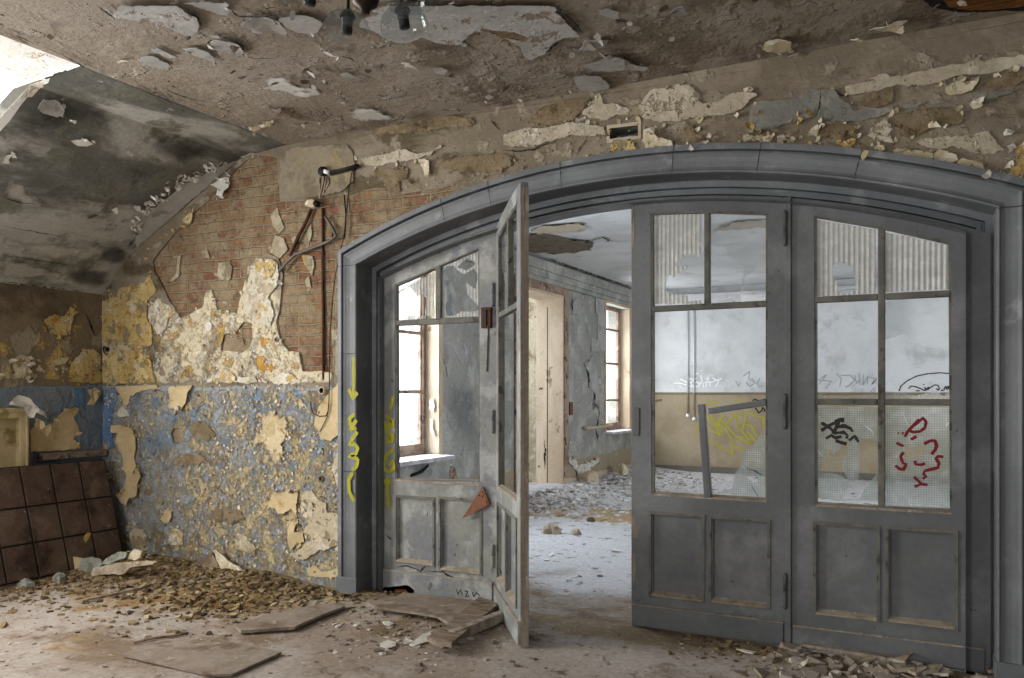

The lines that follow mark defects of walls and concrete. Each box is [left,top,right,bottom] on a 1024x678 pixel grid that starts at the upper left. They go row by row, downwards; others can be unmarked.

peeling [104,0,340,69]
peeling [353,1,1024,178]
peeling [248,119,274,136]
damp [8,184,34,205]
damp [2,239,103,283]
damp [103,249,123,261]
peeling [0,354,36,383]
flaking render [29,152,454,579]